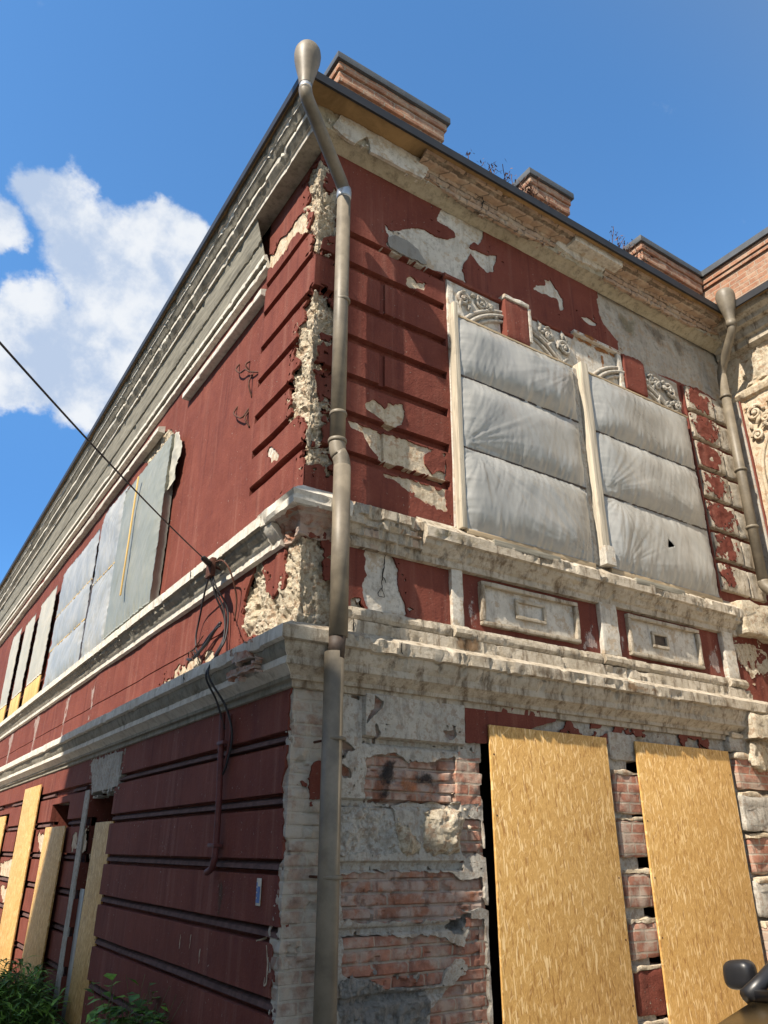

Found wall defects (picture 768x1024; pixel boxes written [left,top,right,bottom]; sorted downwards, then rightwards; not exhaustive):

spalling [270,160,337,268]
peeling [378,159,623,290]
spalling [287,290,334,477]
peeling [534,280,564,311]
flaking render [582,292,722,404]
peeling [348,400,449,512]
spalling [226,505,332,682]
peeling [351,550,412,616]
peeling [734,640,768,686]
flaking render [338,698,488,1024]